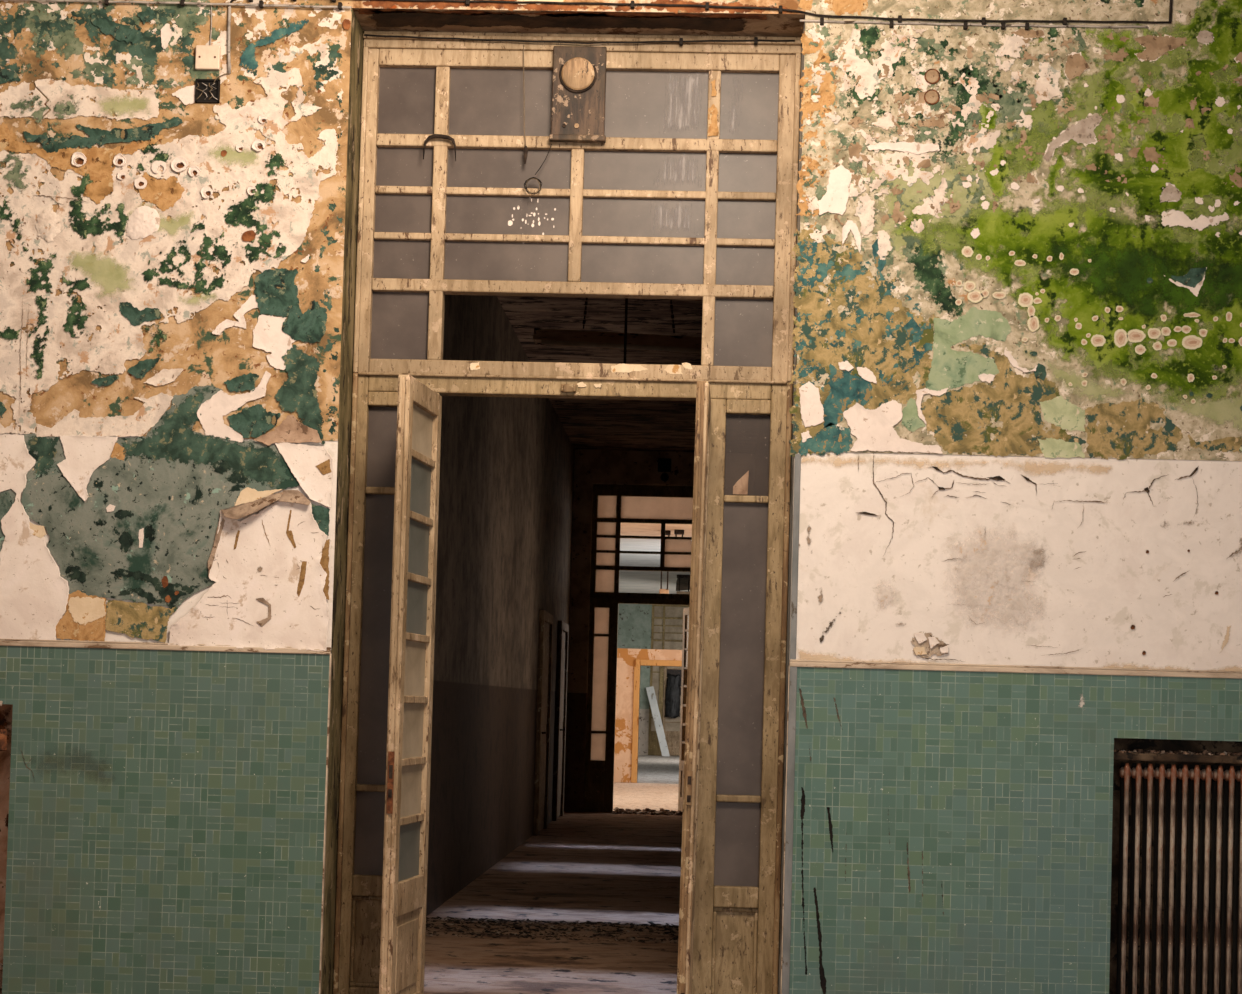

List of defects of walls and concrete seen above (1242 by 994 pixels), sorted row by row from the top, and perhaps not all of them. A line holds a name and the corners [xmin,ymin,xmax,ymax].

peeling [0,0,345,651]
flaking render [789,0,1242,460]
crack [858,453,1199,656]